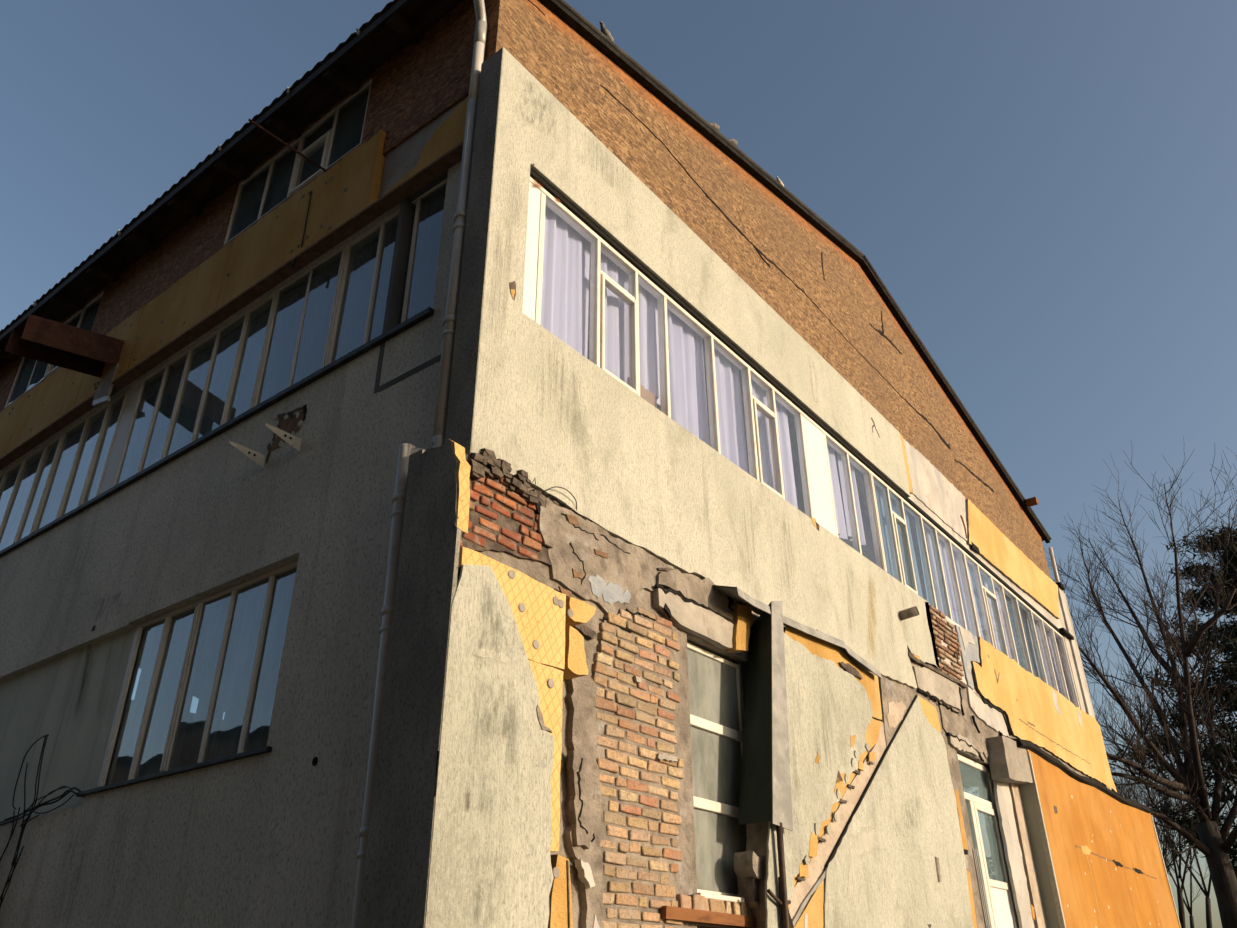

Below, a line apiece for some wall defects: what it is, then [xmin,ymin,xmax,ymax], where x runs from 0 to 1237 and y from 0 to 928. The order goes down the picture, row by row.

crack [600,85,994,493]
flaking render [460,448,751,928]
spalling [878,605,1011,762]
flaking render [814,744,874,843]
spalling [993,781,1035,928]